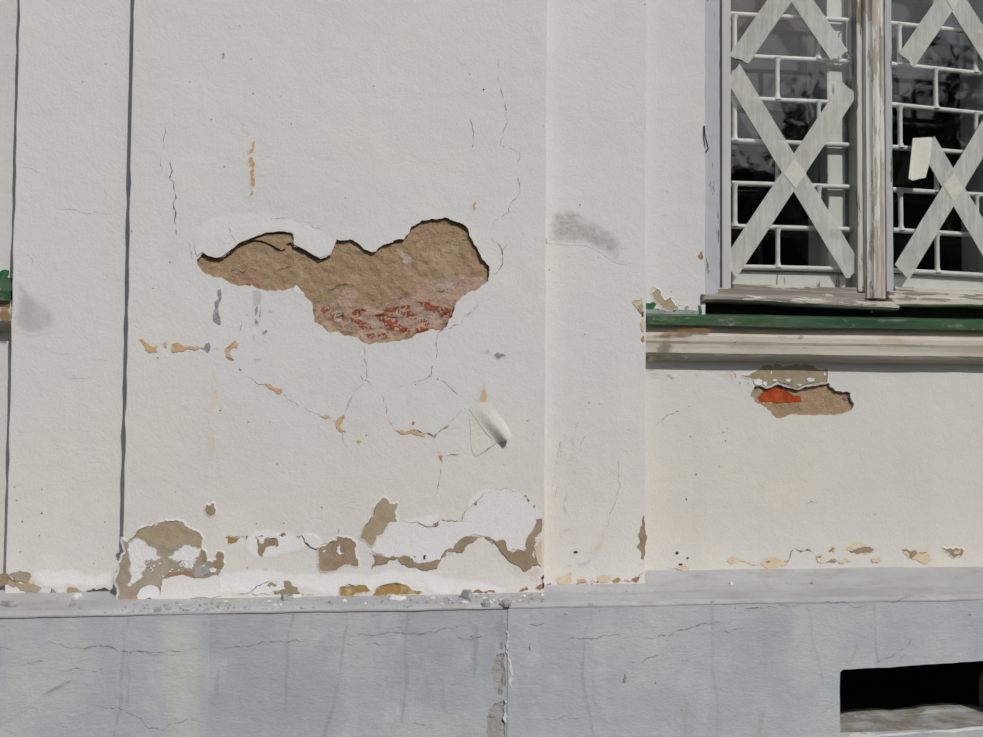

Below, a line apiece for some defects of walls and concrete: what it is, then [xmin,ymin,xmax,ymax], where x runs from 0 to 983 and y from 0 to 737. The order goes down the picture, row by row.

flaking render [197,218,489,344]
flaking render [723,362,852,418]
peeling [0,487,640,612]
peeling [727,557,789,569]
peeling [816,542,881,564]
peeling [902,549,934,564]
peeling [941,546,966,559]
flaking render [486,631,513,737]